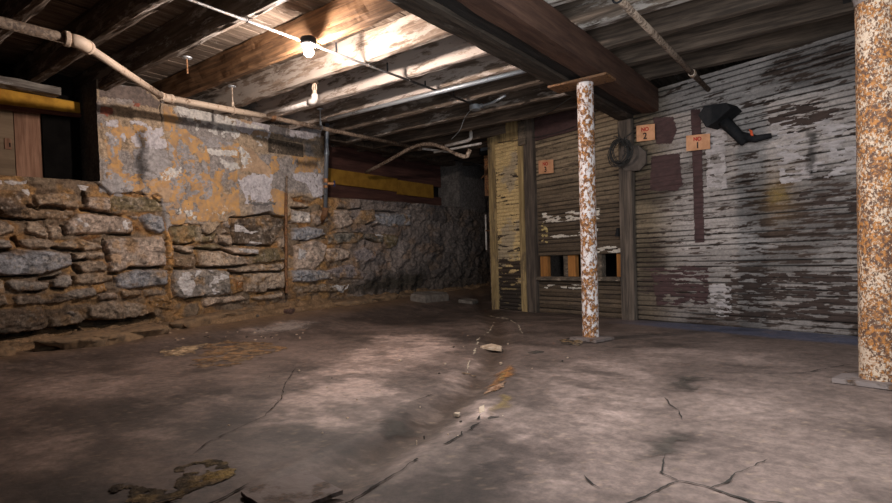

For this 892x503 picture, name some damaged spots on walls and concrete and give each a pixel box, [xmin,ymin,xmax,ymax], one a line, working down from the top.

peeling [99,86,324,226]
peeling [650,109,727,243]
peeling [767,104,857,212]
peeling [541,211,580,243]
peeling [650,266,858,323]
crack [443,415,480,444]
crack [345,458,418,503]
crack [627,453,782,503]